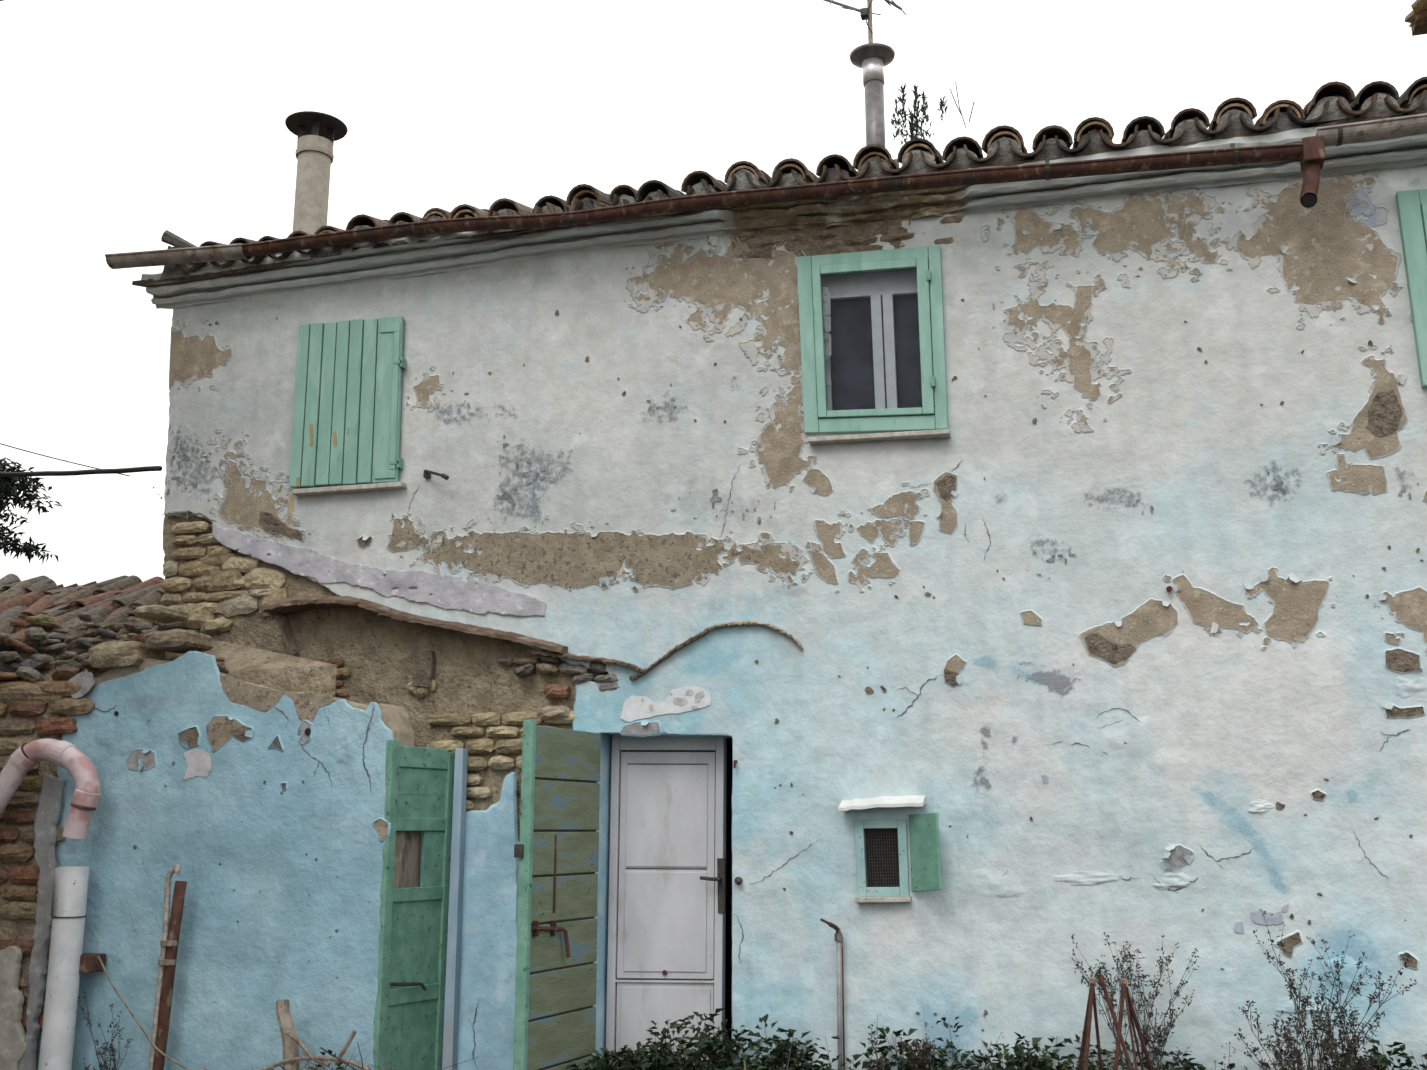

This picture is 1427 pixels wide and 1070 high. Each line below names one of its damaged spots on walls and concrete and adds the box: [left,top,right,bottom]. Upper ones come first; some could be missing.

peeling [980,169,1412,434]
peeling [169,316,233,395]
peeling [404,365,454,413]
peeling [624,233,834,503]
peeling [1317,340,1409,496]
peeling [356,471,959,599]
peeling [1073,566,1336,668]
peeling [1365,586,1427,675]
peeling [178,675,333,753]
spalling [1381,700,1426,719]
peeling [126,747,175,771]